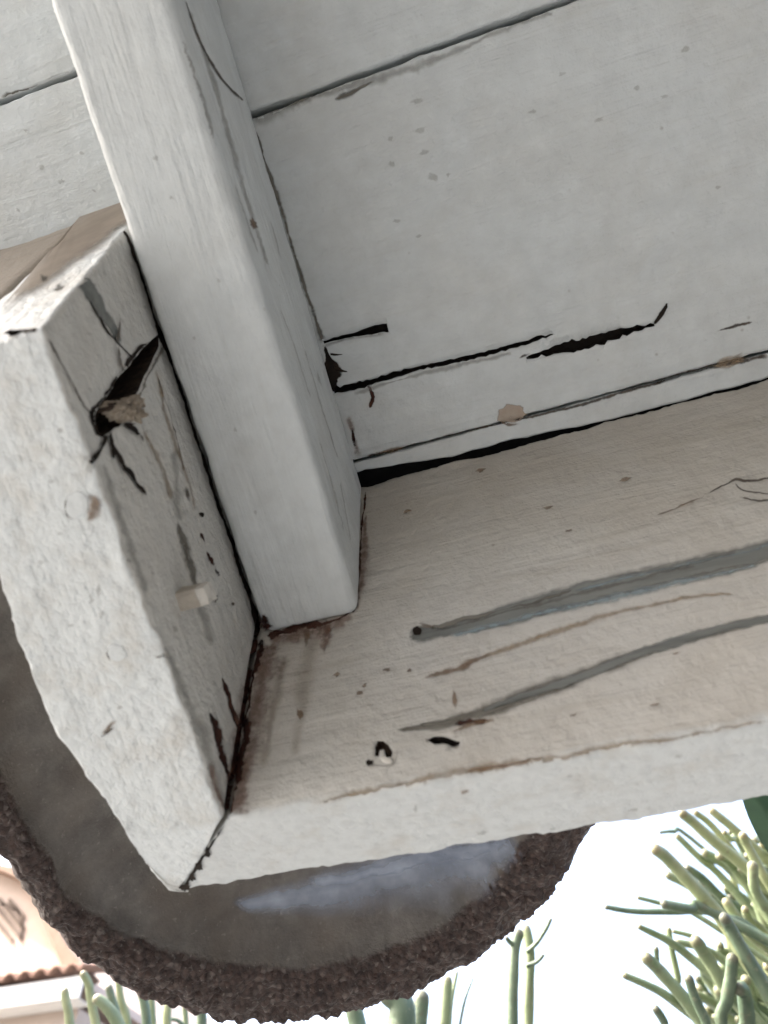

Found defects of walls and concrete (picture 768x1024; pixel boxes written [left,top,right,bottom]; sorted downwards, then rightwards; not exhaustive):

crack [324,303,667,393]
crack [721,322,751,330]
peeling [497,404,526,426]
crack [369,354,766,456]
leakage [411,541,768,641]
leakage [399,615,768,731]
peeling [366,741,393,766]